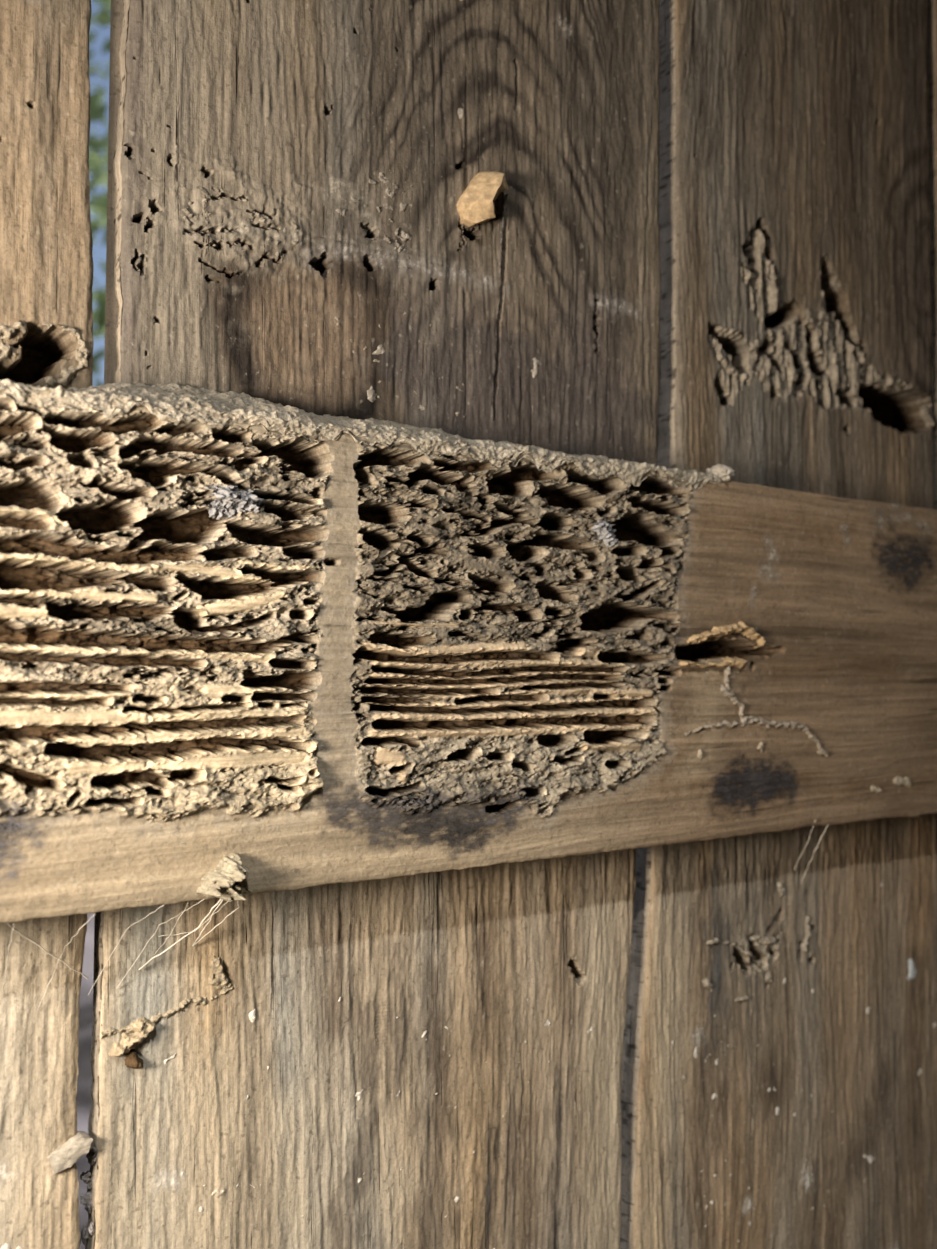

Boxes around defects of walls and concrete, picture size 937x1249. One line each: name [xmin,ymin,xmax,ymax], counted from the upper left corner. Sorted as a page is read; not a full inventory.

spalling [0,321,78,387]
peeling [708,217,935,434]
damp [874,504,934,588]
spalling [0,398,340,809]
spalling [353,446,784,814]
damp [713,755,797,814]
spalling [706,881,786,990]
peeling [797,915,816,965]